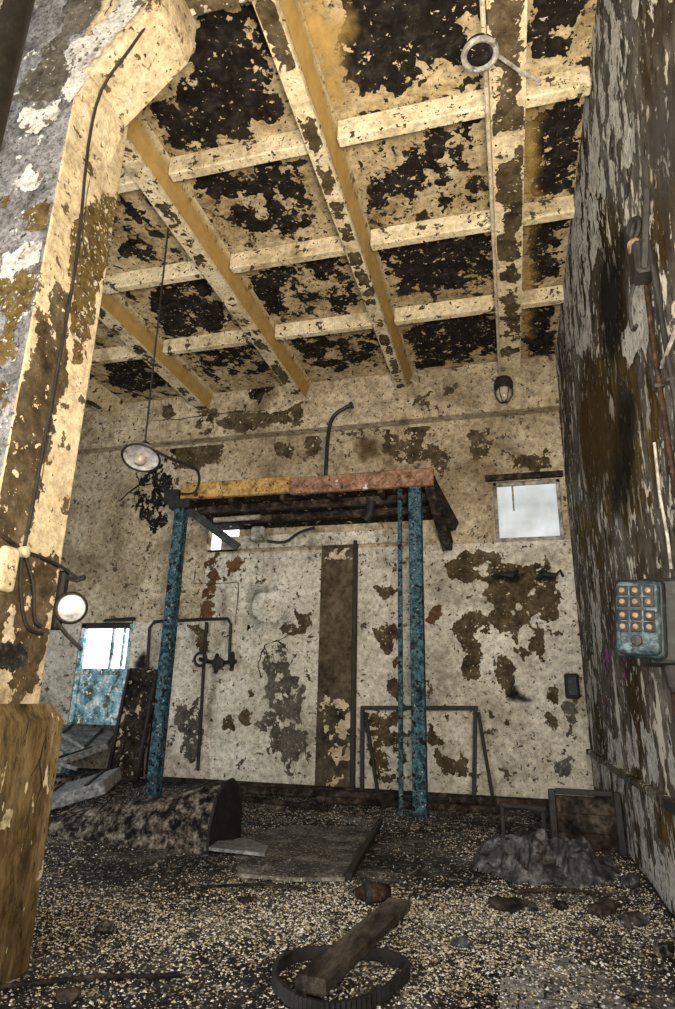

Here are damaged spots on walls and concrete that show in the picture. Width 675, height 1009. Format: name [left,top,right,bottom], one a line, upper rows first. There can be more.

peeling [12,0,145,134]
peeling [151,0,302,155]
peeling [0,163,44,208]
peeling [189,158,314,236]
peeling [0,192,305,698]
peeling [241,0,659,784]
damp [613,390,635,513]
peeling [172,697,204,764]
peeling [222,598,350,787]